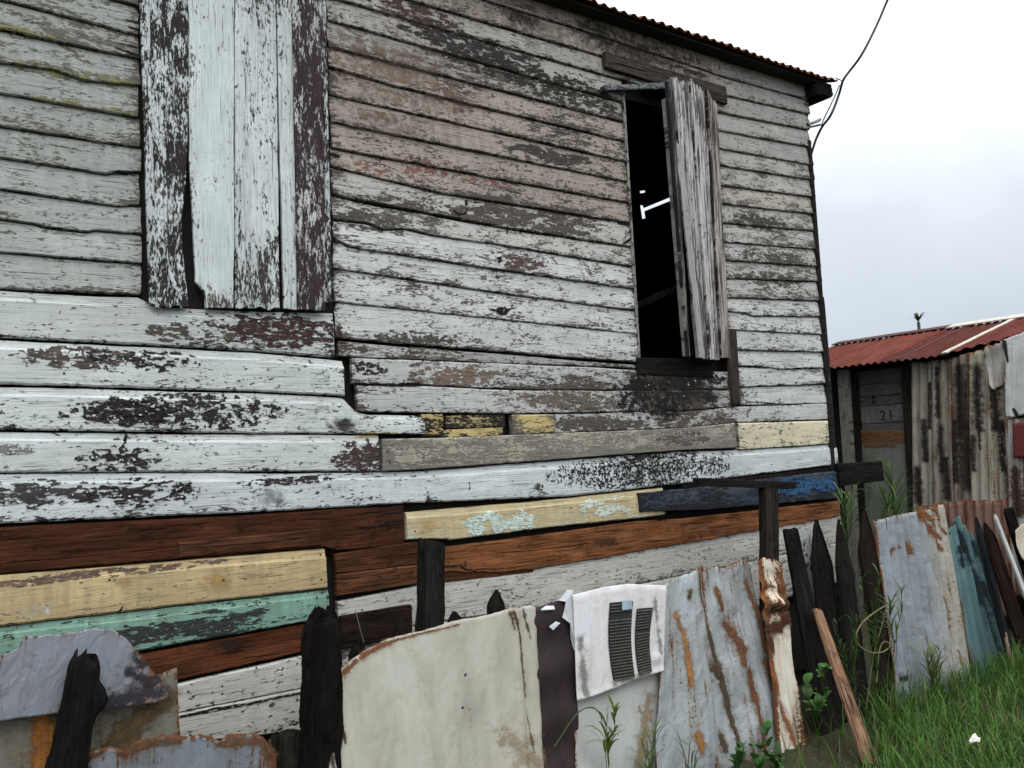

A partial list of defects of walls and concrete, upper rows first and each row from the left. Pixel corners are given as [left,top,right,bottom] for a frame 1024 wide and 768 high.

peeling [368,0,622,117]
peeling [7,312,350,375]
peeling [58,393,289,431]
peeling [0,444,201,510]
peeling [237,432,398,487]
rust [1011,460,1024,517]
peeling [460,509,535,536]
rust [916,506,947,552]
rust [674,612,693,688]
rust [687,573,767,755]
rust [744,564,797,748]
rust [118,738,182,756]